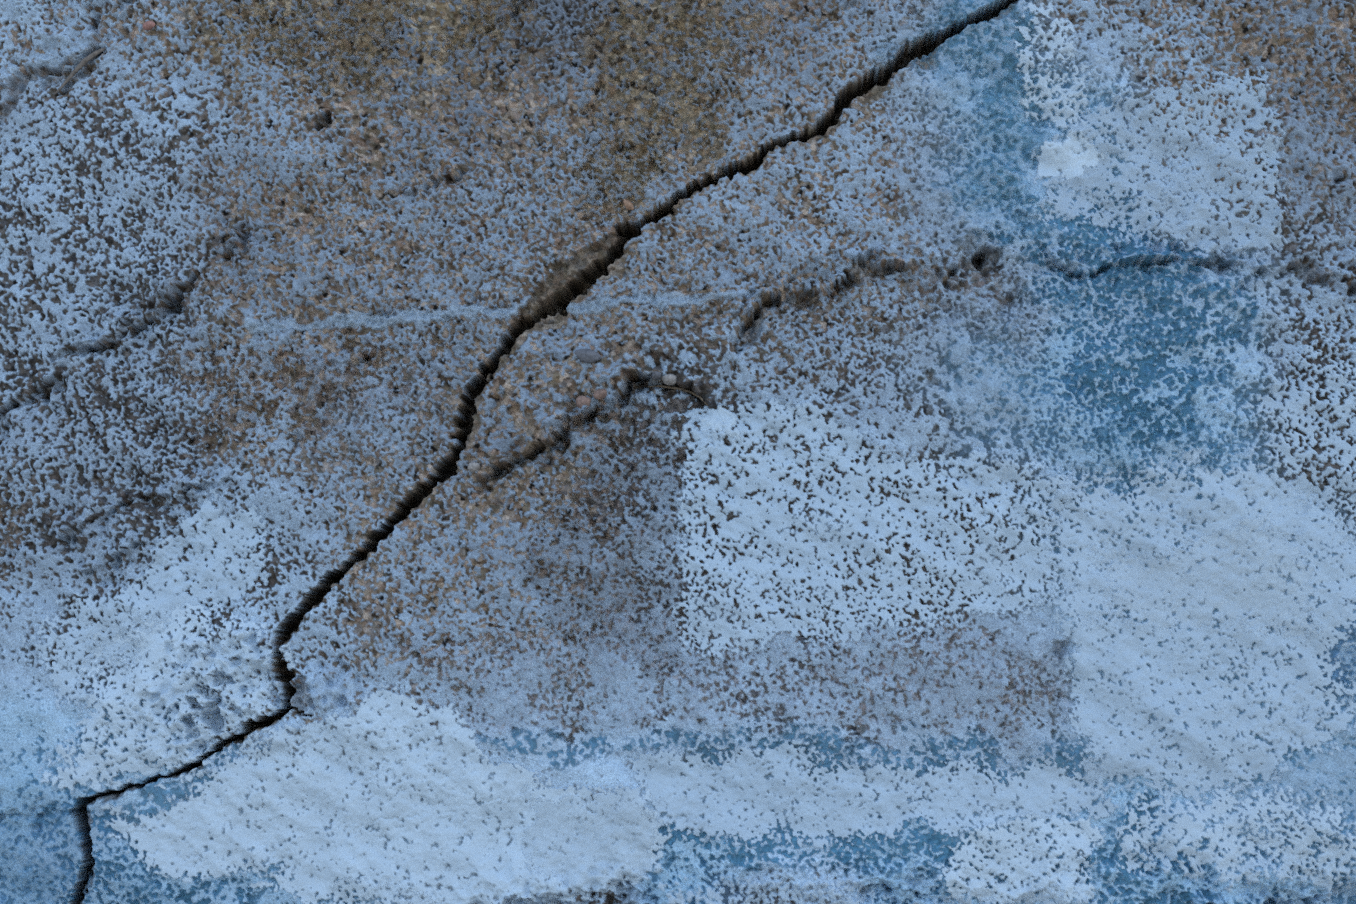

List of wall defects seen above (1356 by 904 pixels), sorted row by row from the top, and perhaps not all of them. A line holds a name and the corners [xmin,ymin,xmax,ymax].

crack [0,271,199,432]
crack [63,0,1021,904]